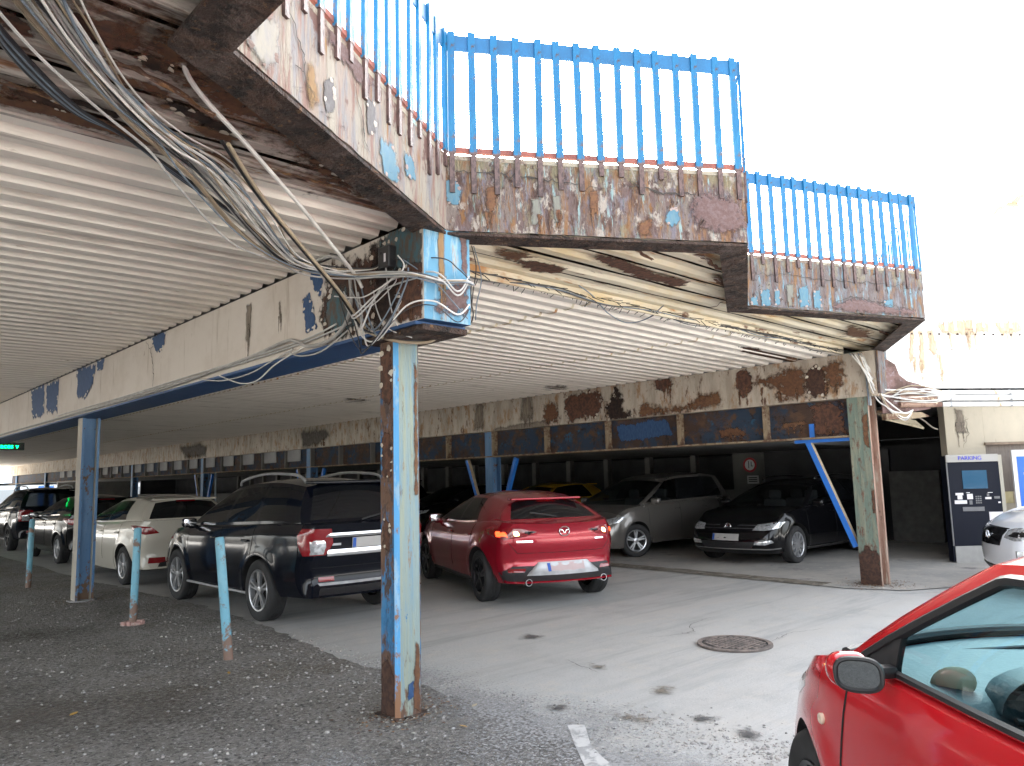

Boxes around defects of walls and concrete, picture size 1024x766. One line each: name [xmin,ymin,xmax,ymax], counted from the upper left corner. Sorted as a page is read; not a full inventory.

rust [73,0,361,197]
peeling [366,98,416,183]
peeling [303,227,422,339]
rust [496,249,568,274]
rust [595,255,690,286]
peeling [751,289,781,306]
peeling [31,379,59,419]
peeling [76,358,104,400]
rust [735,357,849,436]
peeling [381,432,392,478]
rust [859,546,882,586]
rust [381,659,394,717]